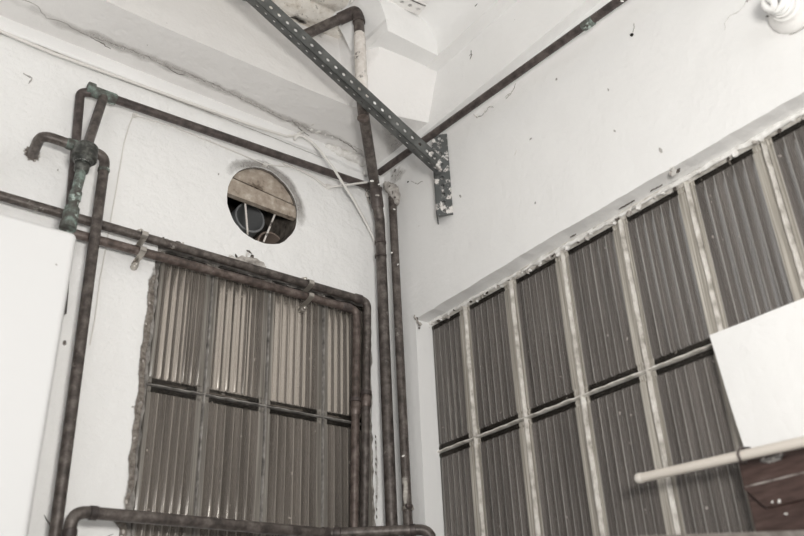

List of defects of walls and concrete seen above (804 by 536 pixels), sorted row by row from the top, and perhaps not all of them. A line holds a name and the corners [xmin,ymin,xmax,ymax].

crack [24,0,362,158]